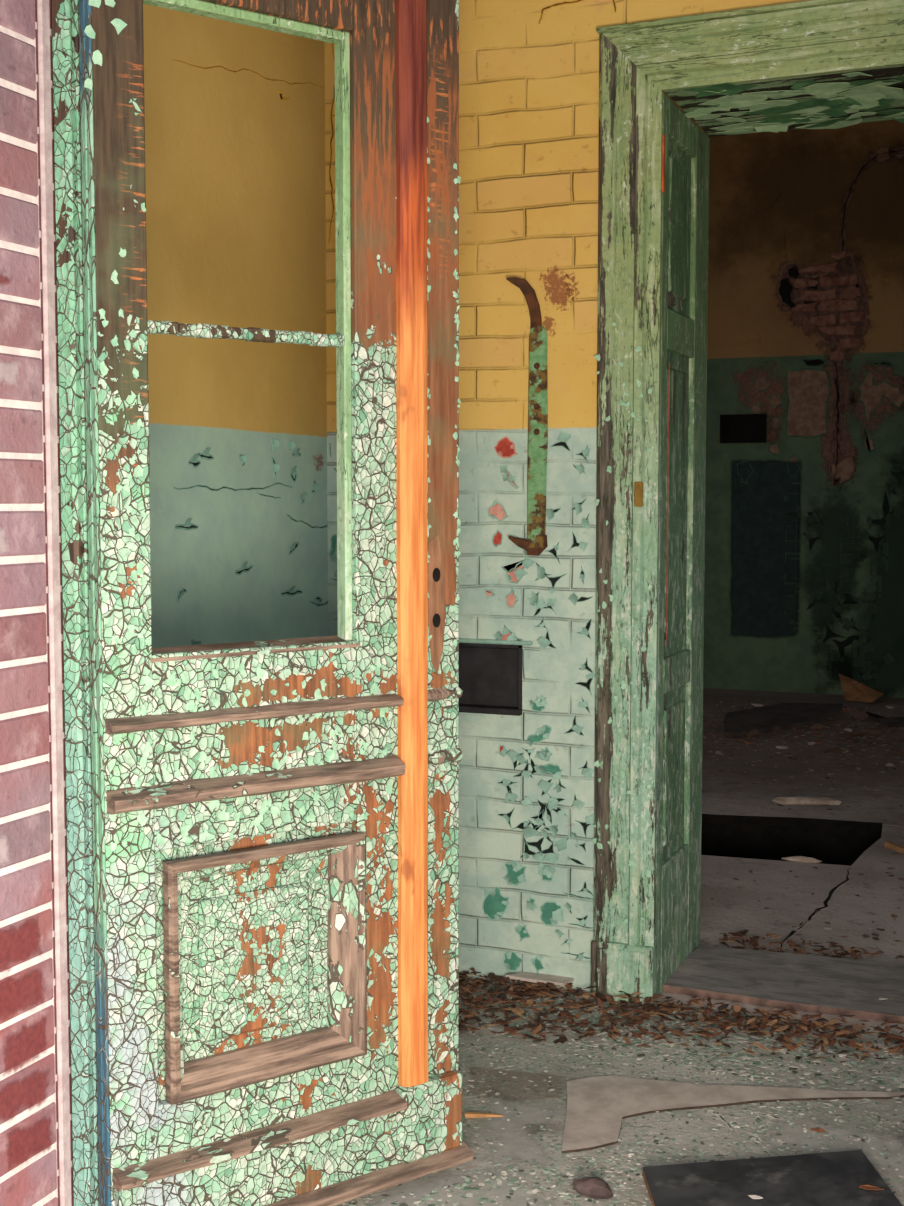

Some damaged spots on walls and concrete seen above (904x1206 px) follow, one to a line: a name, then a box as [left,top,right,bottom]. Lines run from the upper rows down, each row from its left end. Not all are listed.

peeling [84,25,102,66]
peeling [88,0,127,34]
crack [538,0,584,24]
peeling [684,72,904,135]
peeling [99,308,137,350]
rust [539,266,579,336]
peeling [494,436,519,489]
peeling [483,499,614,650]
damp [730,452,904,697]
peeling [252,679,344,773]
peeling [482,658,610,920]
crack [779,867,852,951]